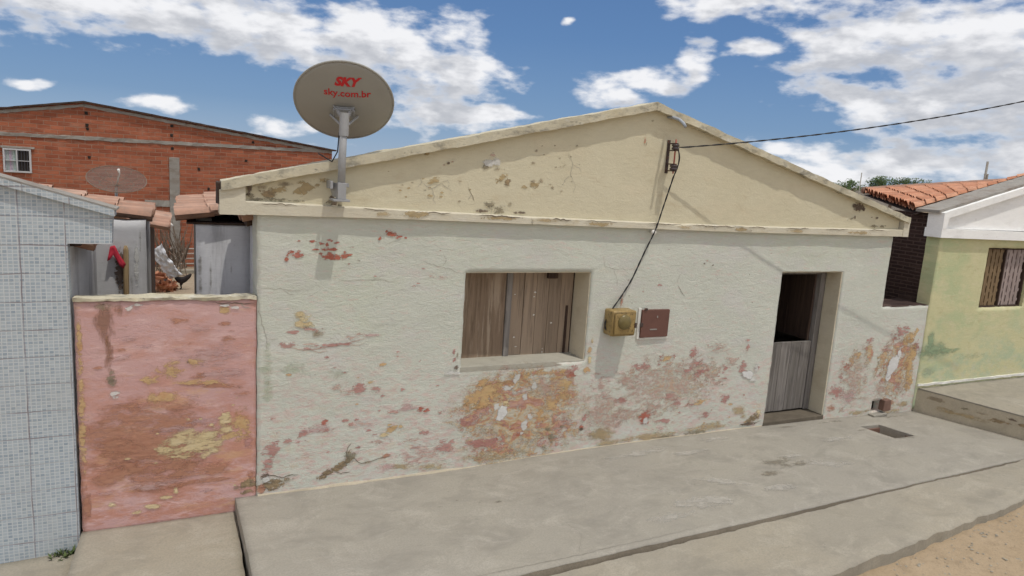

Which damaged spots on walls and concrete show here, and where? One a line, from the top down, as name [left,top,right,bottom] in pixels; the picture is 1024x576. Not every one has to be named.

flaking render [483,152,572,192]
peeling [284,239,353,265]
peeling [280,311,384,405]
peeling [828,325,919,412]
peeling [154,387,247,464]
peeling [233,339,763,495]